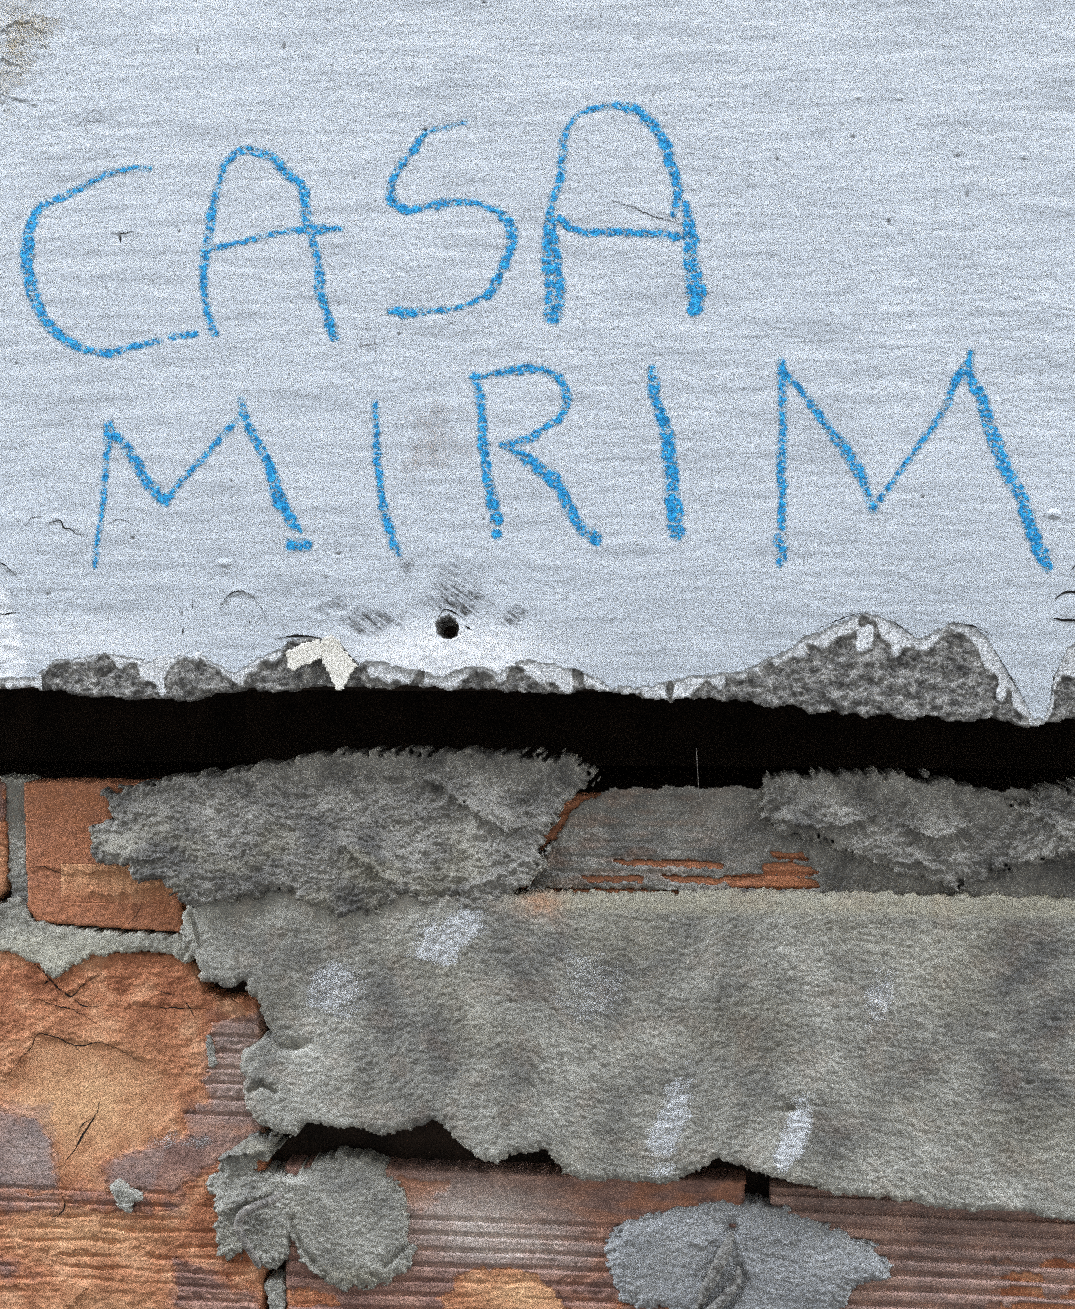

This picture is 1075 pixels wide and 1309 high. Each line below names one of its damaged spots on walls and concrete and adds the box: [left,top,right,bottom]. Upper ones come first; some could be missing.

spalling [0,613,1075,728]
spalling [0,820,12,902]
spalling [60,864,173,904]
crack [7,963,145,1077]
spalling [0,950,272,1309]
spalling [286,1287,341,1309]
spalling [437,1266,566,1309]
spalling [1000,1258,1075,1309]